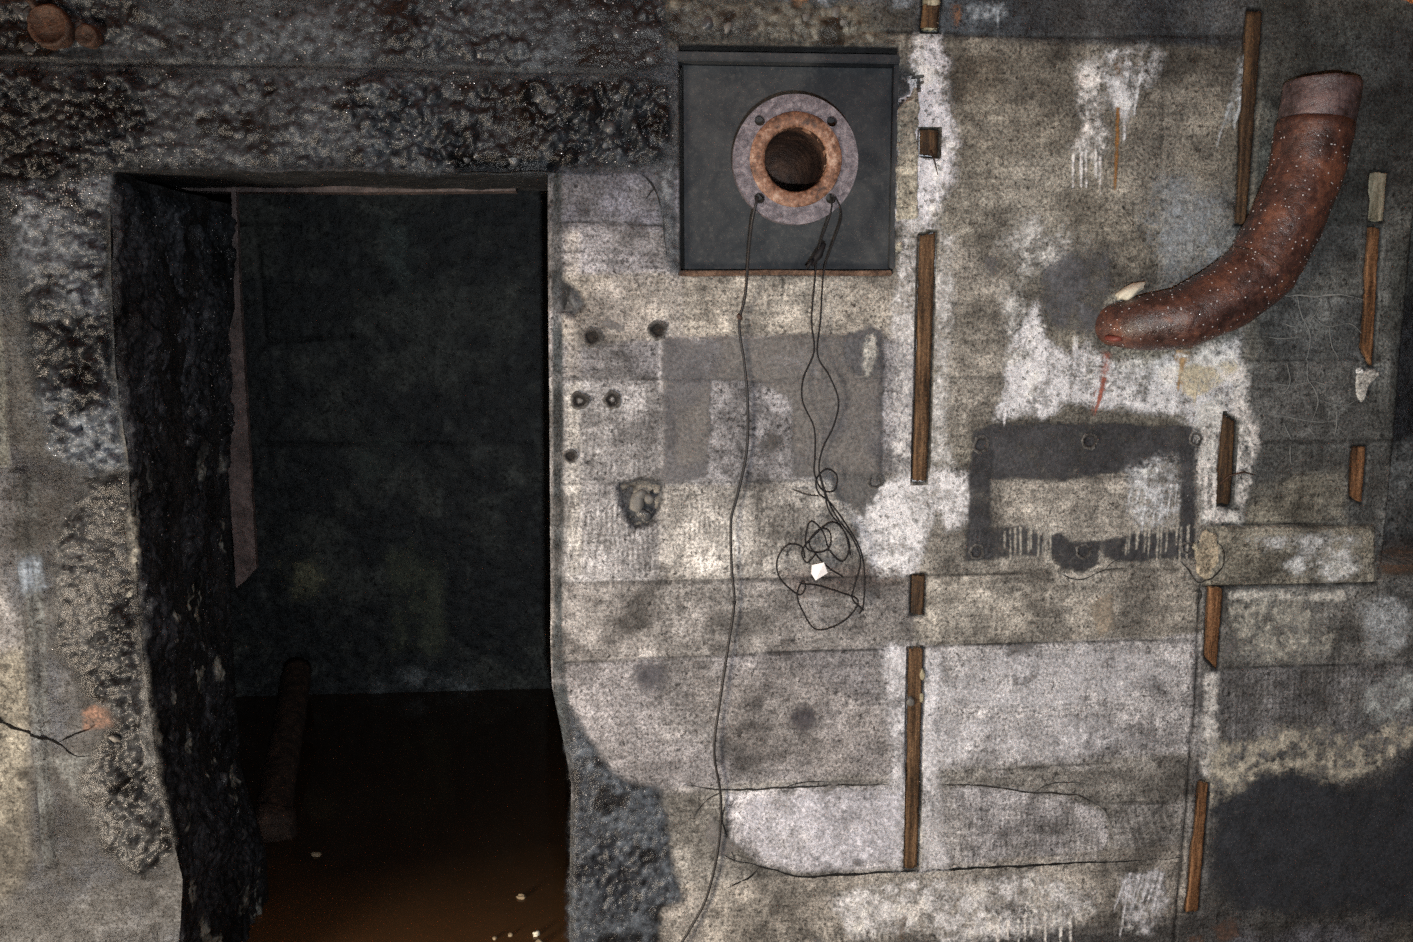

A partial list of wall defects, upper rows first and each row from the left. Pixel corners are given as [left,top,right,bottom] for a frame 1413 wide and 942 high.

leakage [1072,50,1158,188]
leakage [1216,64,1243,144]
leakage [1144,179,1221,269]
leakage [832,34,973,576]
rust [1094,354,1110,413]
leakage [996,216,1259,531]
crack [0,718,100,757]
crack [689,781,1180,942]
leakage [743,643,1168,942]
leakage [1200,673,1413,918]